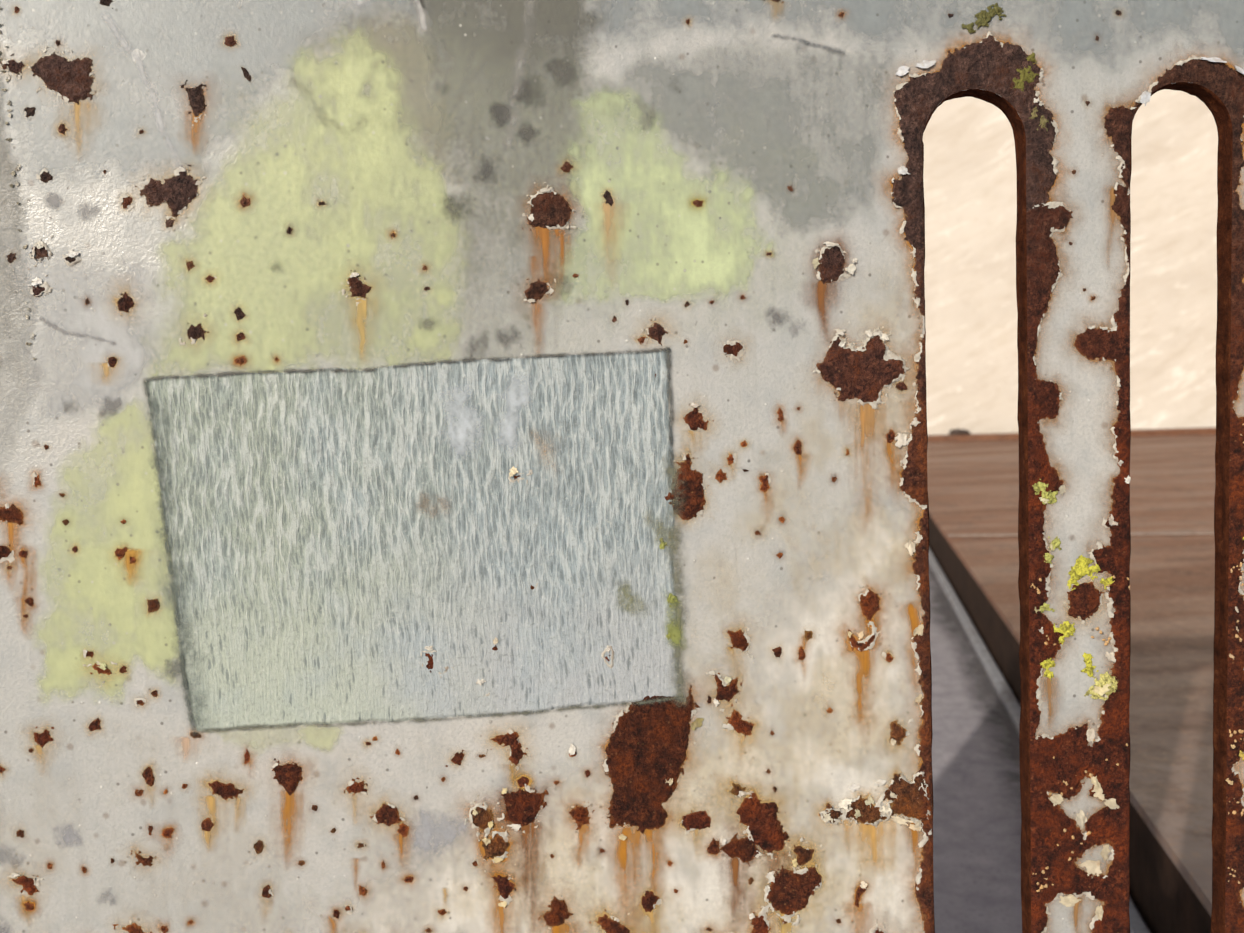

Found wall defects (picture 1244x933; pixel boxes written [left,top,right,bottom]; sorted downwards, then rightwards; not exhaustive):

corrosion [0,46,96,136]
corrosion [119,165,207,228]
corrosion [522,182,577,325]
corrosion [812,31,1244,933]
corrosion [269,759,304,847]
corrosion [446,750,464,767]
corrosion [464,728,549,933]
corrosion [532,665,832,933]
peeling [819,772,932,862]